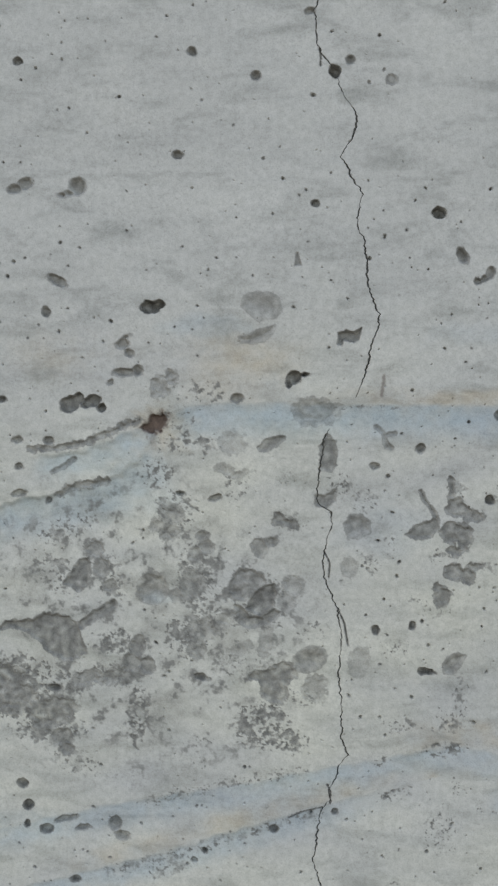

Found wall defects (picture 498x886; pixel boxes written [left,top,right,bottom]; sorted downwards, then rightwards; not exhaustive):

crack [312,0,381,398]
spalling [289,395,407,541]
spalling [0,367,333,808]
crack [288,430,349,886]
spalling [346,645,371,678]
spalling [339,475,498,618]
spalling [442,652,467,675]
spalling [409,741,474,762]